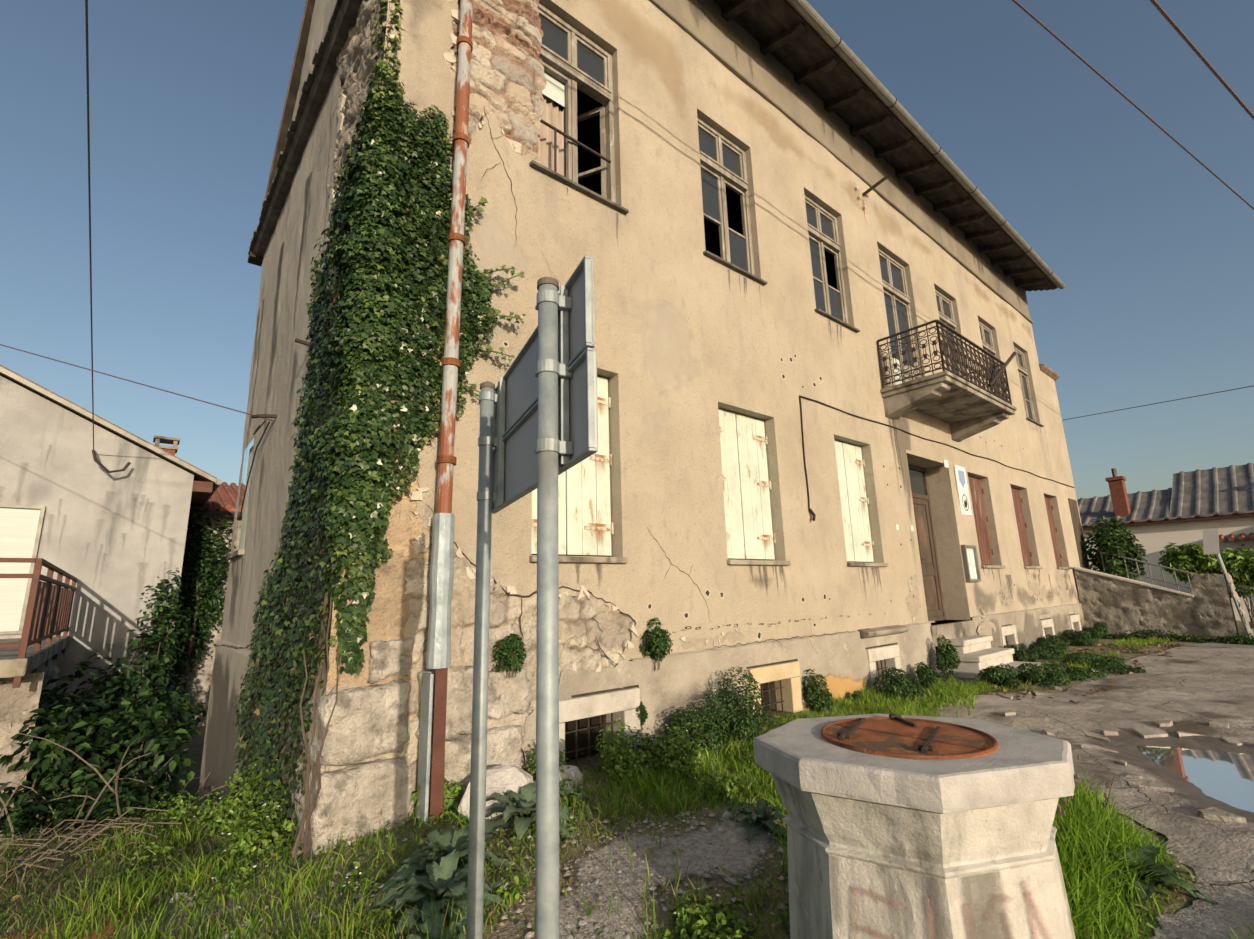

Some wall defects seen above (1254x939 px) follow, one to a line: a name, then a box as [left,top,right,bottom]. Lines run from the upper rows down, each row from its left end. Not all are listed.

spalling [443,0,547,162]
spalling [322,0,394,418]
crack [480,108,561,283]
spalling [321,424,537,820]
spalling [559,584,639,681]
crack [648,529,709,612]
crack [705,630,858,654]
crack [1070,652,1240,729]
crack [1014,710,1247,832]
crack [1196,870,1254,891]